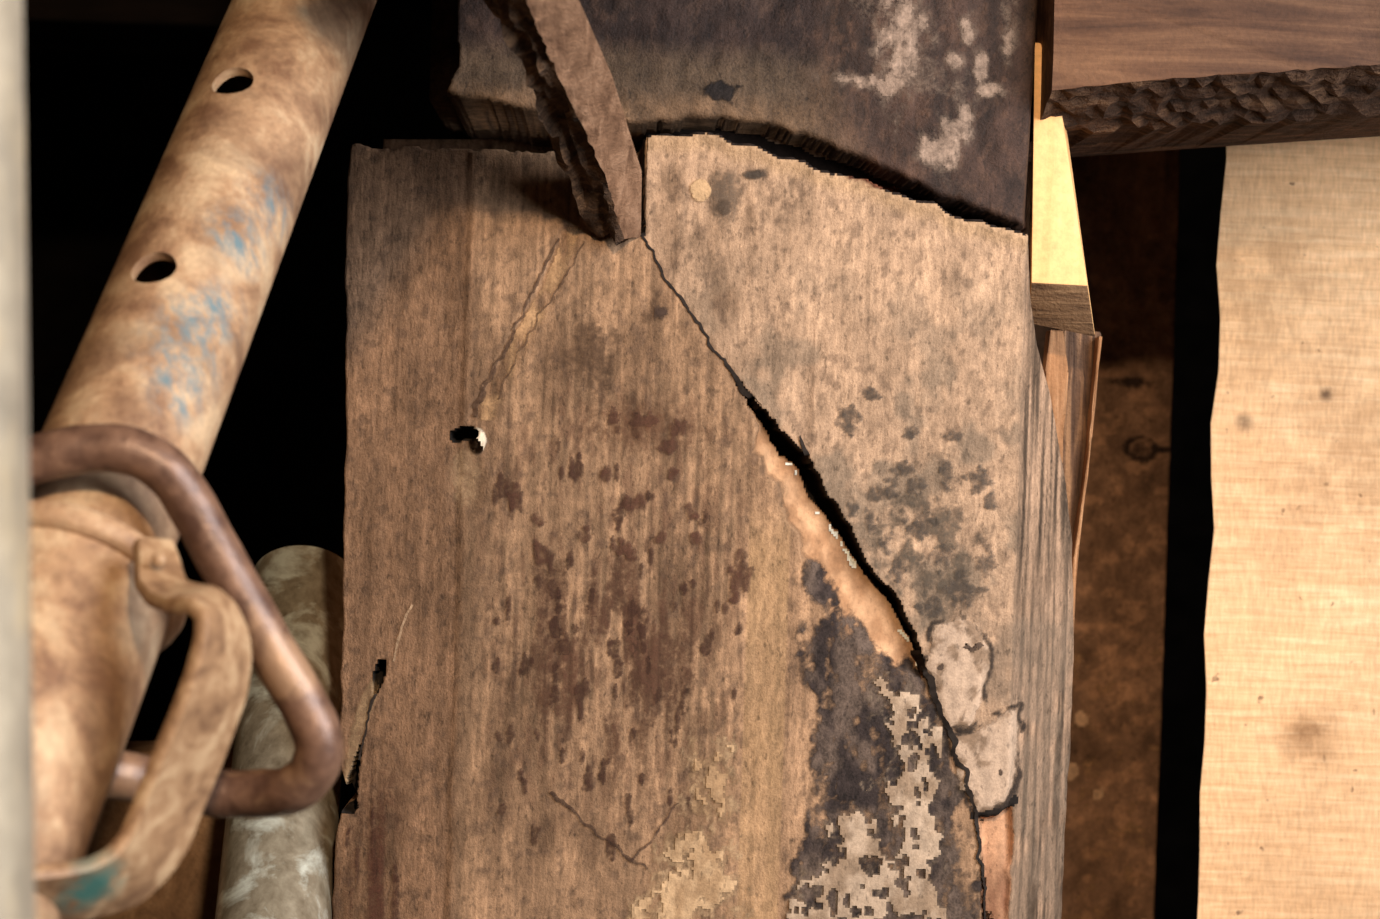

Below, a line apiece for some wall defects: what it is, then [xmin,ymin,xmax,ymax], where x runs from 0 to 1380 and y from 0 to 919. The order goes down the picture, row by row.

damp [835,0,935,96]
damp [1003,32,1014,55]
damp [919,20,1004,169]
damp [556,441,584,481]
damp [493,473,523,520]
crack [639,128,1025,919]
damp [519,502,714,790]
crack [358,694,377,760]
damp [783,559,982,919]
damp [625,773,644,824]
damp [606,833,616,861]